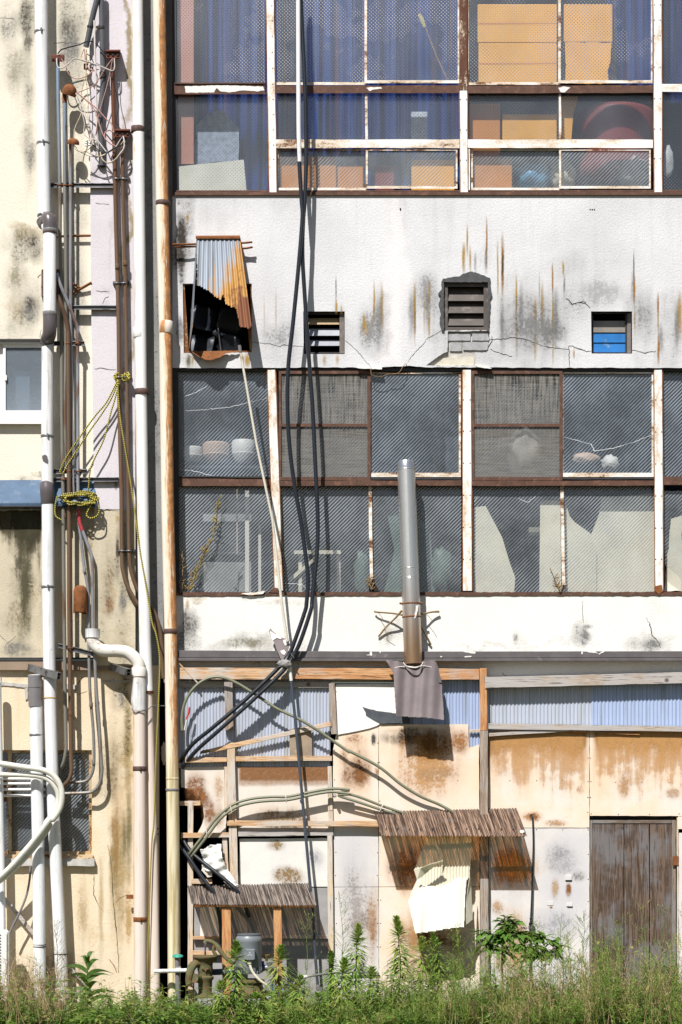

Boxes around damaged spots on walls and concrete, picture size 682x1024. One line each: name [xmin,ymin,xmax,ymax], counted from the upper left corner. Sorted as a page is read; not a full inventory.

rust [485,226,504,288]
rust [534,264,565,324]
spalling [426,331,492,369]
crack [476,337,588,367]
damp [0,510,40,612]